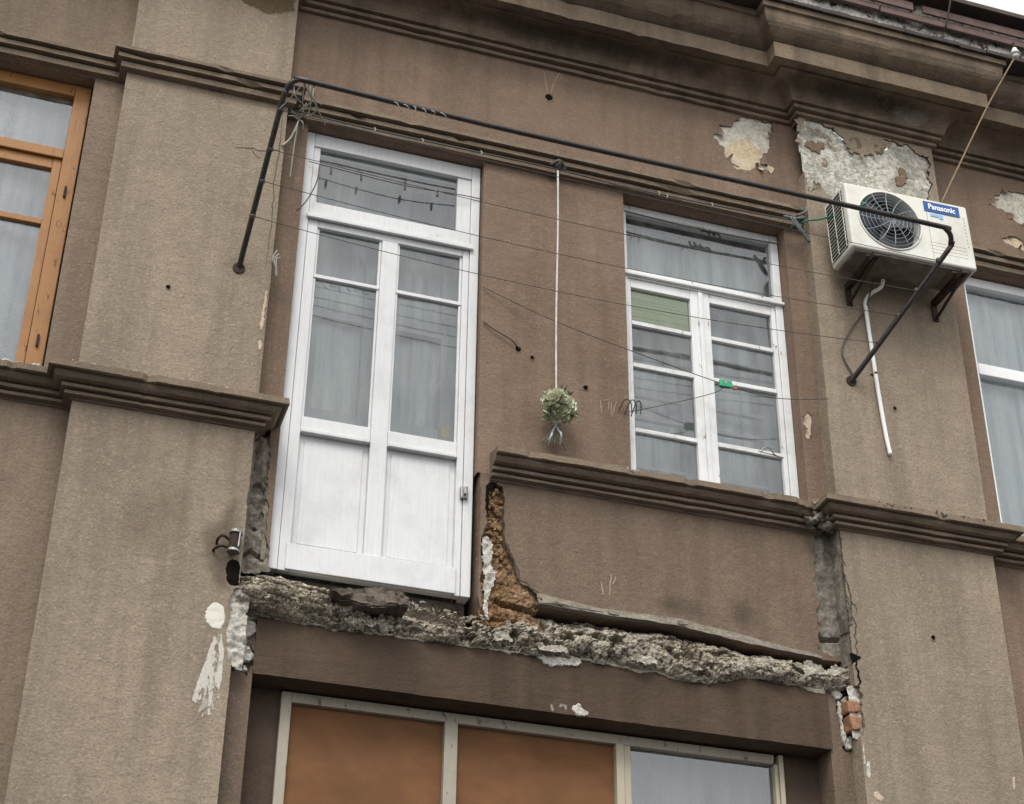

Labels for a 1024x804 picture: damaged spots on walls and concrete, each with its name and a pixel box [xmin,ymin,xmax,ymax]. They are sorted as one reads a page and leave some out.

peeling [714,117,774,174]
peeling [794,118,931,200]
peeling [988,188,1024,226]
peeling [1003,235,1024,251]
peeling [803,412,812,439]
spalling [205,433,871,779]
crack [838,529,858,653]
efflorescence [192,634,224,716]